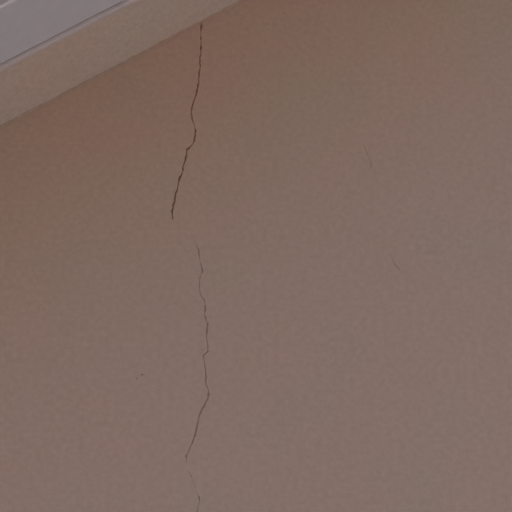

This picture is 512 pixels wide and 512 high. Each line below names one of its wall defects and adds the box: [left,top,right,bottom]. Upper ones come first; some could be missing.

crack [171,23,204,220]
crack [185,232,210,512]